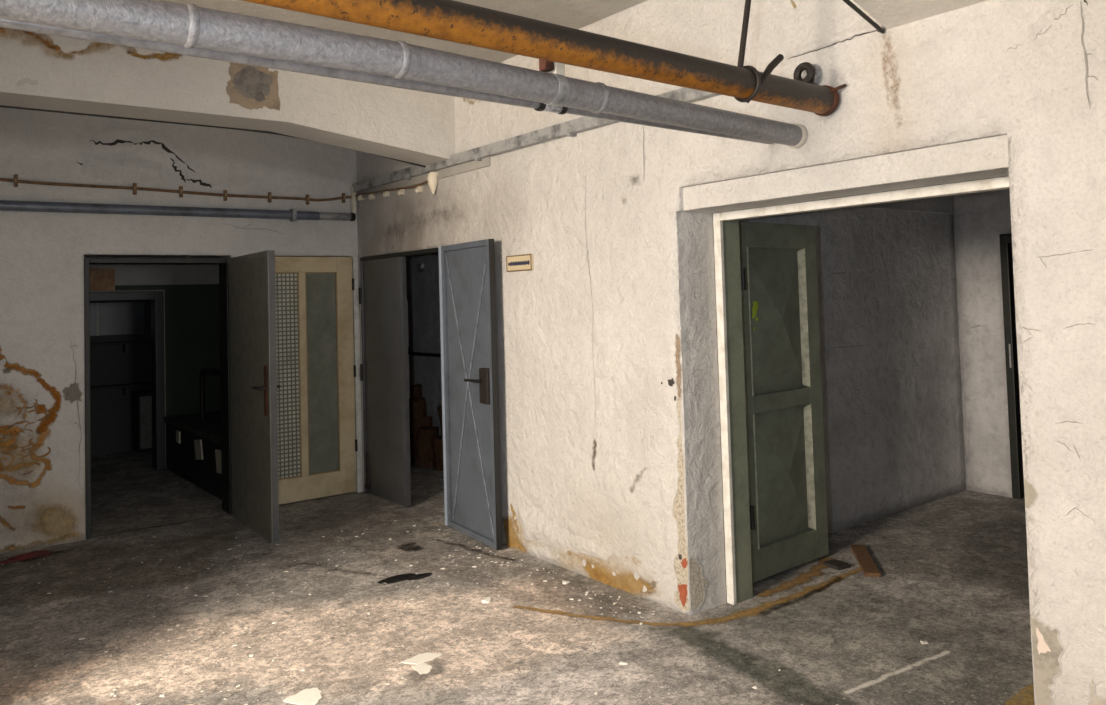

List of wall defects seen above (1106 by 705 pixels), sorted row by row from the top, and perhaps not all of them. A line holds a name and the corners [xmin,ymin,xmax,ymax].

peeling [225,62,281,111]
crack [77,129,212,188]
spalling [661,377,709,613]
damp [568,552,650,593]
spalling [634,571,658,593]
spalling [1030,614,1066,705]